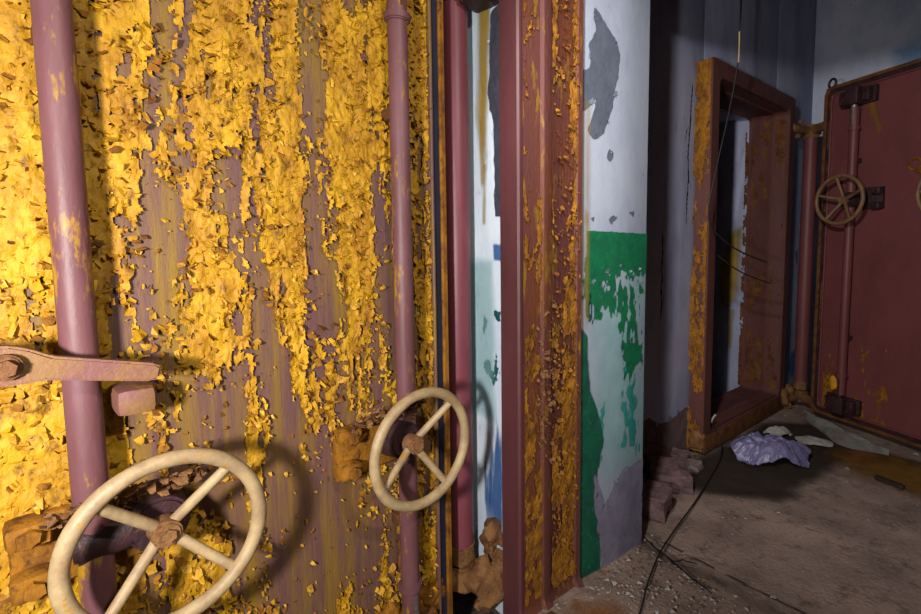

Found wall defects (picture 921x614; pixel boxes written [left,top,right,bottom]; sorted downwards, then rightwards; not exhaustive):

peeling [0,0,59,355]
rust [117,41,174,136]
rust [196,112,303,181]
flaking render [583,8,620,139]
peeling [73,0,397,501]
rust [536,0,580,588]
rust [0,380,62,450]
peeling [582,215,688,568]
peeling [0,380,71,614]
peeling [115,543,226,614]
rust [139,554,219,604]
rust [418,517,447,613]